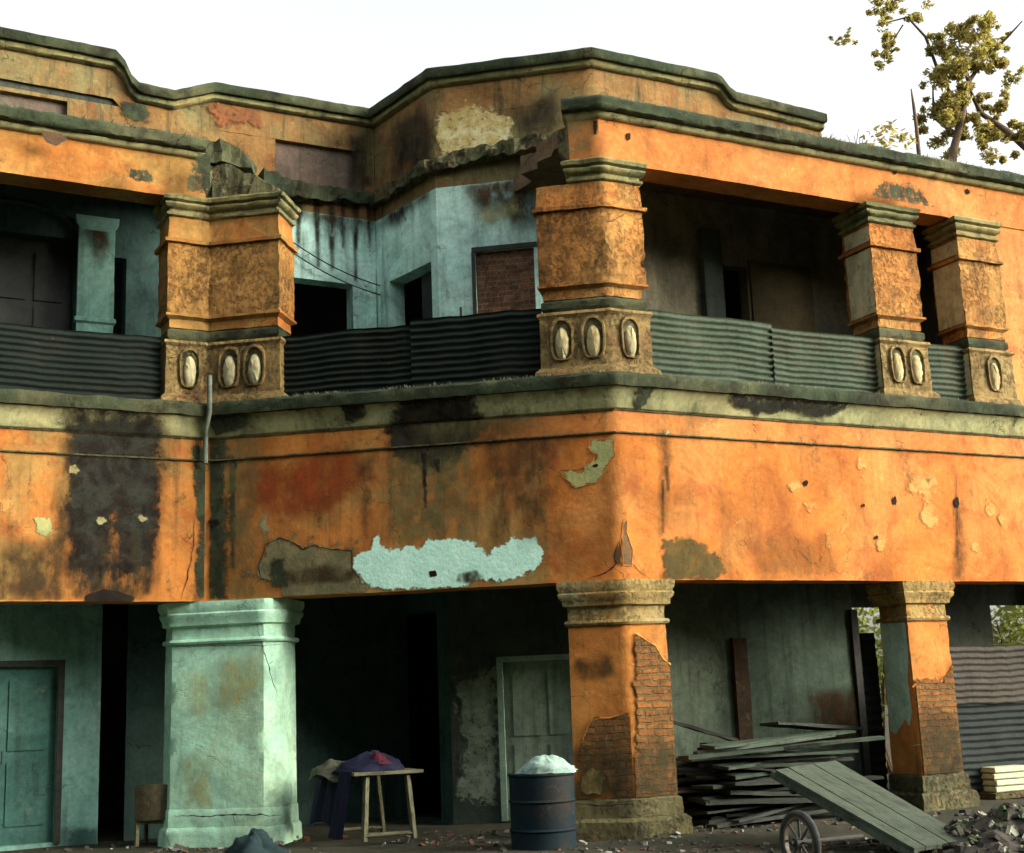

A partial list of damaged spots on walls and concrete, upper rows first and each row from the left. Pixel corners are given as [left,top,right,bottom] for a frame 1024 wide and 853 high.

peeling [436,99,514,155]
damp [296,200,371,280]
damp [730,393,848,418]
damp [384,395,555,539]
peeling [559,437,616,488]
damp [0,407,165,599]
spalling [247,533,369,596]
peeling [458,571,479,583]
damp [661,536,727,579]
spalling [577,632,678,798]
spalling [913,665,963,774]